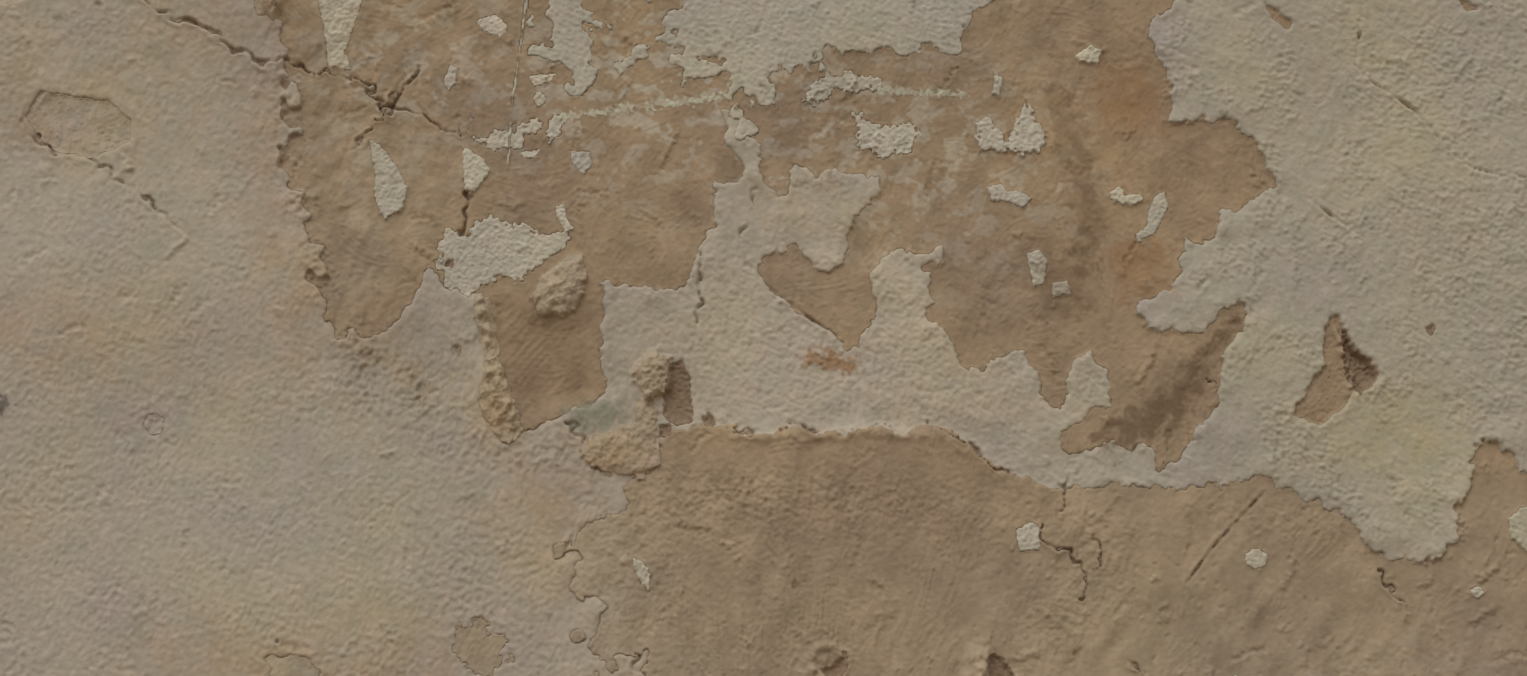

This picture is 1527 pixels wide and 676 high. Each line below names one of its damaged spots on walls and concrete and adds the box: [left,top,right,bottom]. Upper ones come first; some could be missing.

crack [144,0,464,147]
crack [507,0,528,163]
peeling [1266,5,1292,29]
crack [33,134,156,210]
flaking render [276,0,1276,472]
peeling [1294,316,1379,425]
flaking render [553,422,1527,676]
peeling [452,617,515,676]